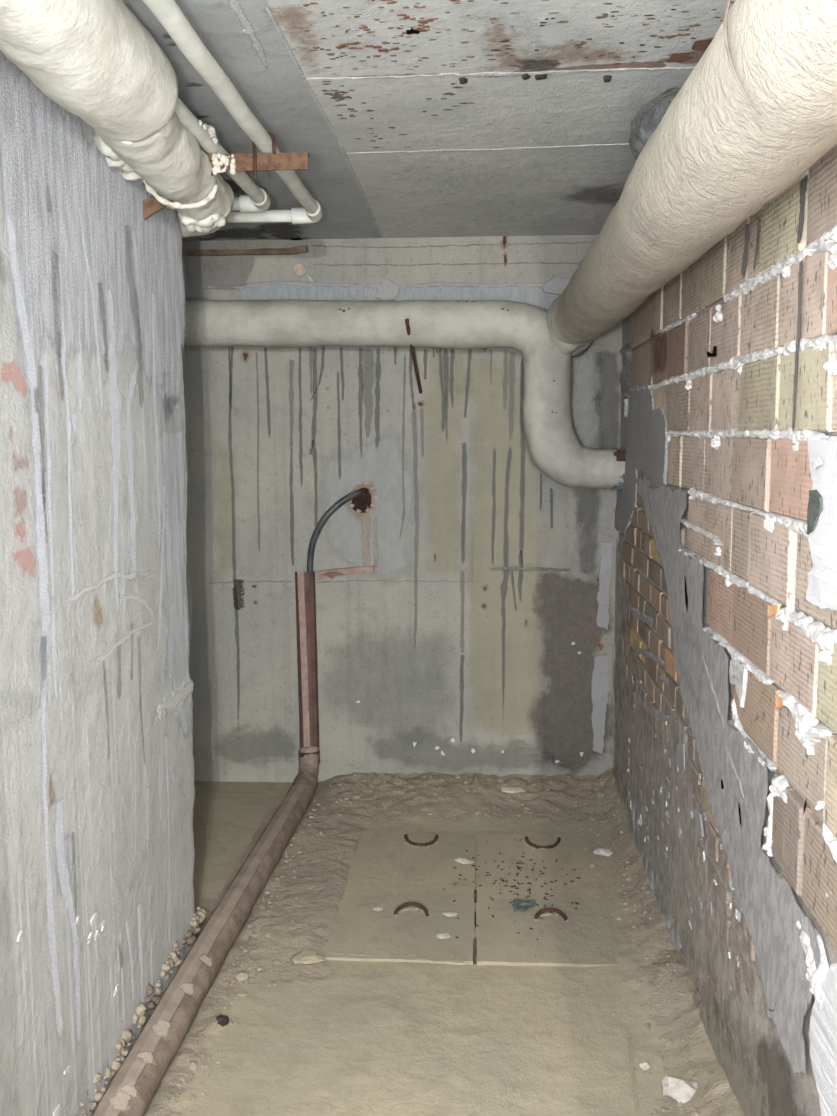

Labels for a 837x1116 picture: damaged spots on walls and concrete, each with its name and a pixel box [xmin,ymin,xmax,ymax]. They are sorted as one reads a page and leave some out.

rust [302,0,723,148]
leakage [201,223,305,240]
leakage [0,56,190,1043]
leakage [228,346,245,714]
leakage [289,346,472,641]
leakage [490,350,525,708]
leakage [532,488,611,772]
peeling [591,343,668,754]
peeling [729,658,748,708]
spalling [767,604,781,617]
peeling [806,431,837,611]
peeling [593,848,613,856]